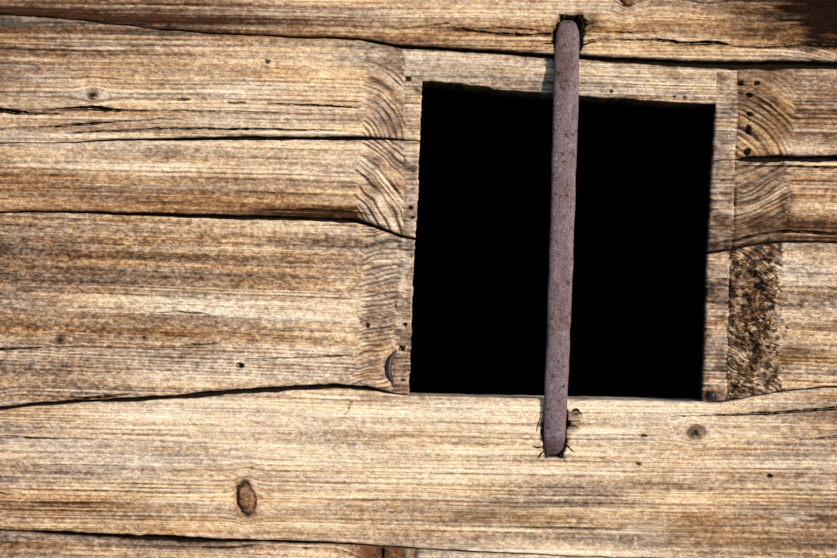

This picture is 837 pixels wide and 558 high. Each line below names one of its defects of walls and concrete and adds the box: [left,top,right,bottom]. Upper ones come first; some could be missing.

crack [0,98,360,134]
crack [0,342,220,350]
crack [64,393,128,401]
crack [670,407,837,417]
crack [0,433,57,441]